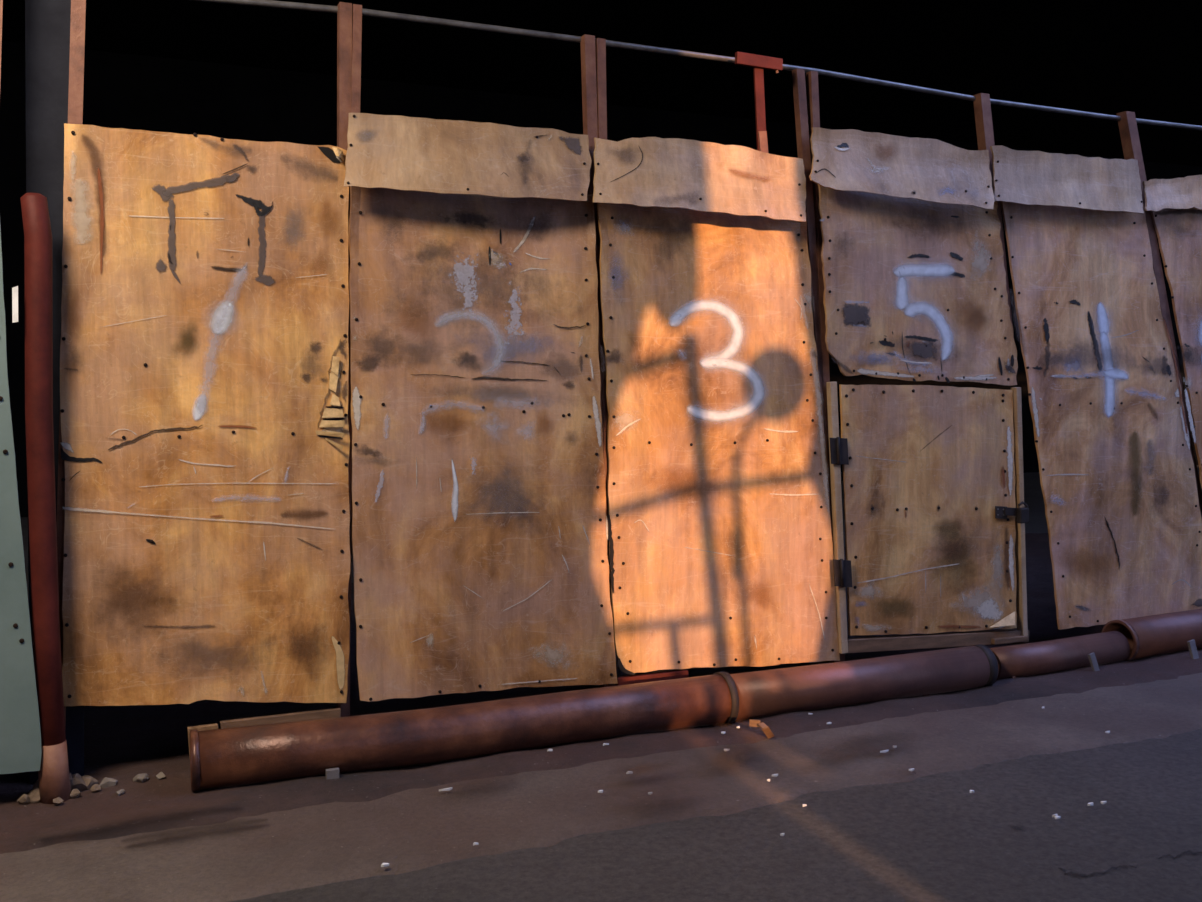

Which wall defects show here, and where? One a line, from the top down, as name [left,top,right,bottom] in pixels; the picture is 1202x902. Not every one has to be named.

crack [1060,851,1202,877]